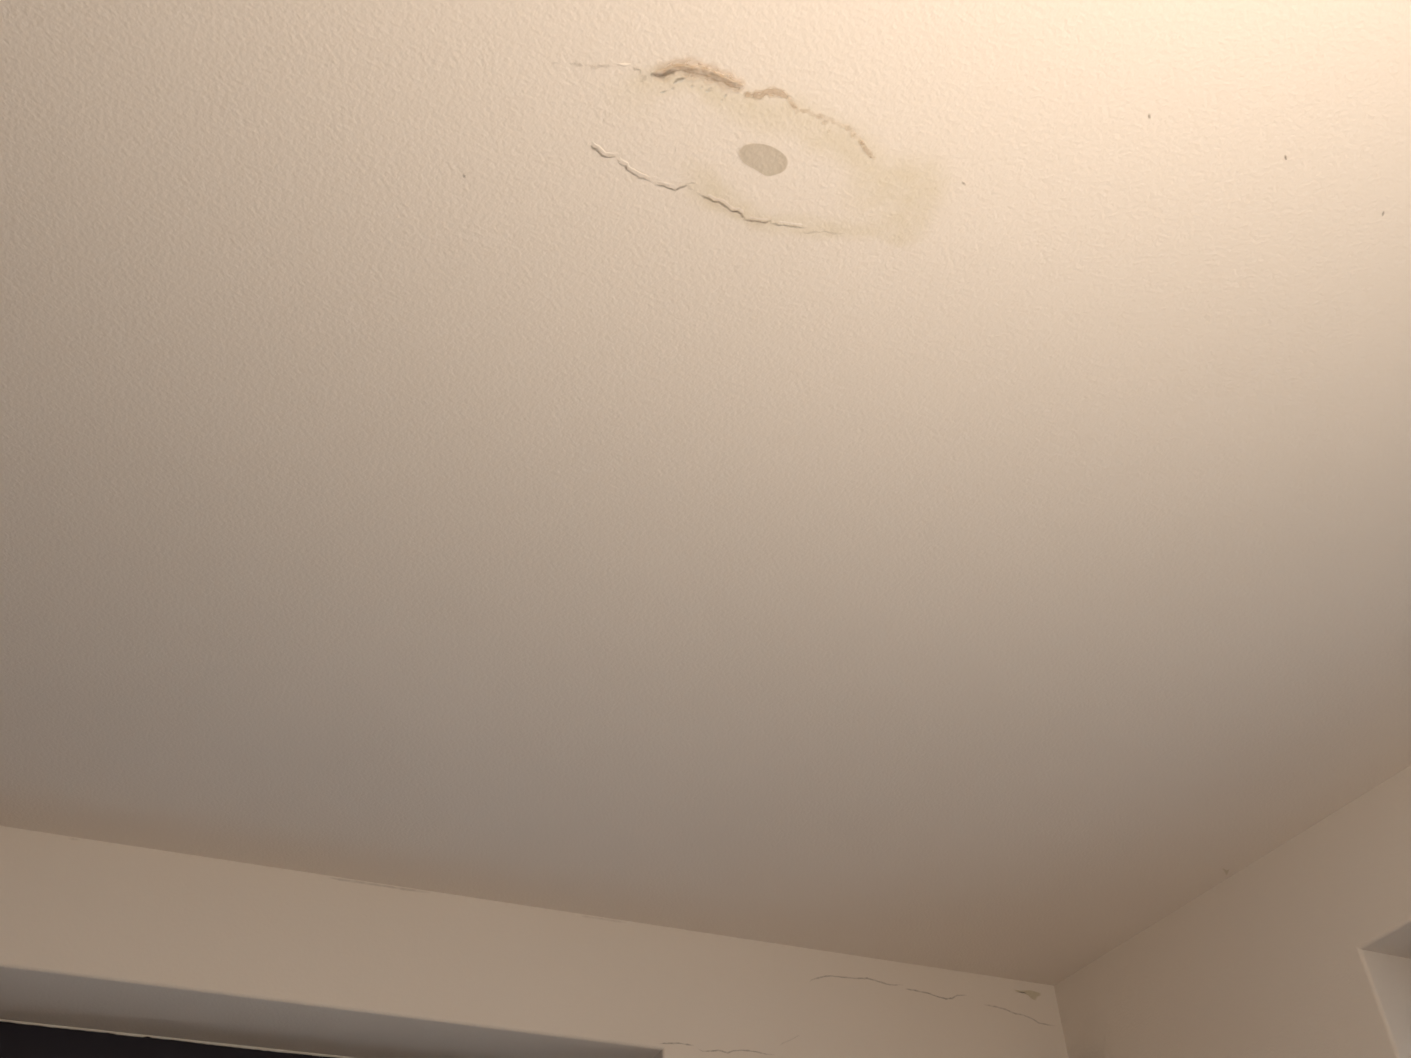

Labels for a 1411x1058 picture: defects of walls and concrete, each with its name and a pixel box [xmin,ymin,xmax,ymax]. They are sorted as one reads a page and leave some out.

peeling [652,63,744,103]
leakage [576,52,969,258]